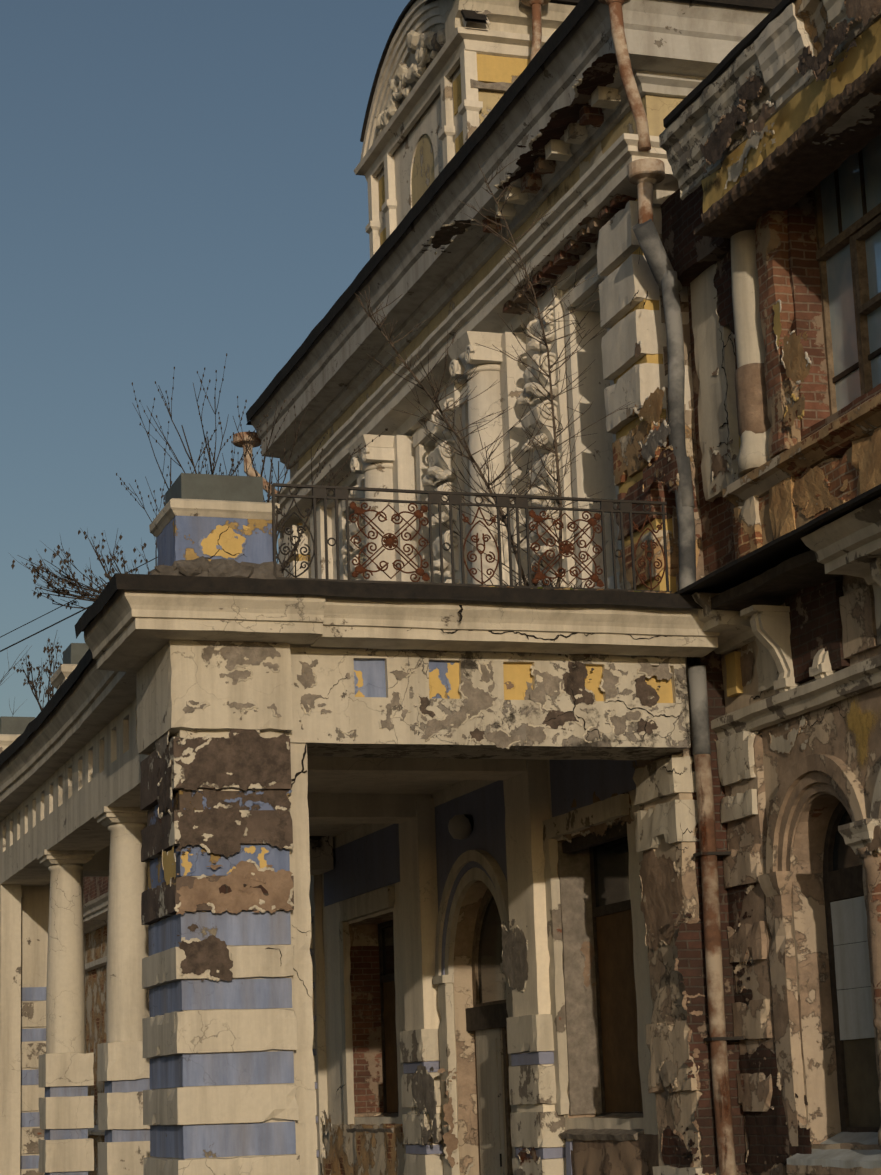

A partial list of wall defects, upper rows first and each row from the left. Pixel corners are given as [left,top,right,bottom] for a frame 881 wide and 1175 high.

flaking render [494,53,619,195]
spalling [700,71,776,190]
spalling [420,218,476,255]
spalling [632,387,679,509]
peeling [198,525,250,560]
peeling [192,640,281,685]
crack [440,605,595,641]
peeling [379,651,661,749]
crack [291,743,307,788]
spalling [152,702,294,982]
spalling [639,845,718,1175]
flaking render [739,1044,812,1175]